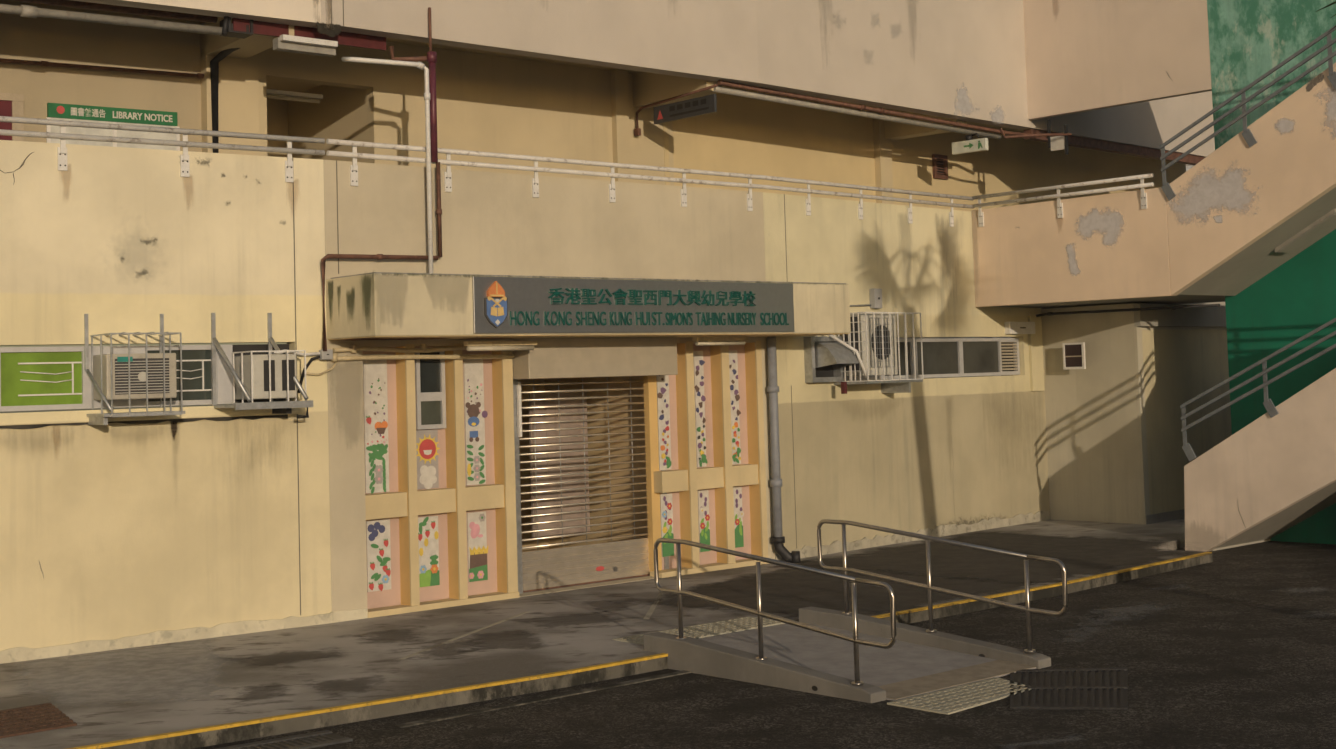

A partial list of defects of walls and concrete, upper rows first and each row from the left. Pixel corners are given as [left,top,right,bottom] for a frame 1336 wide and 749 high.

peeling [1306,73,1336,137]
peeling [1169,168,1256,224]
peeling [1066,208,1124,275]